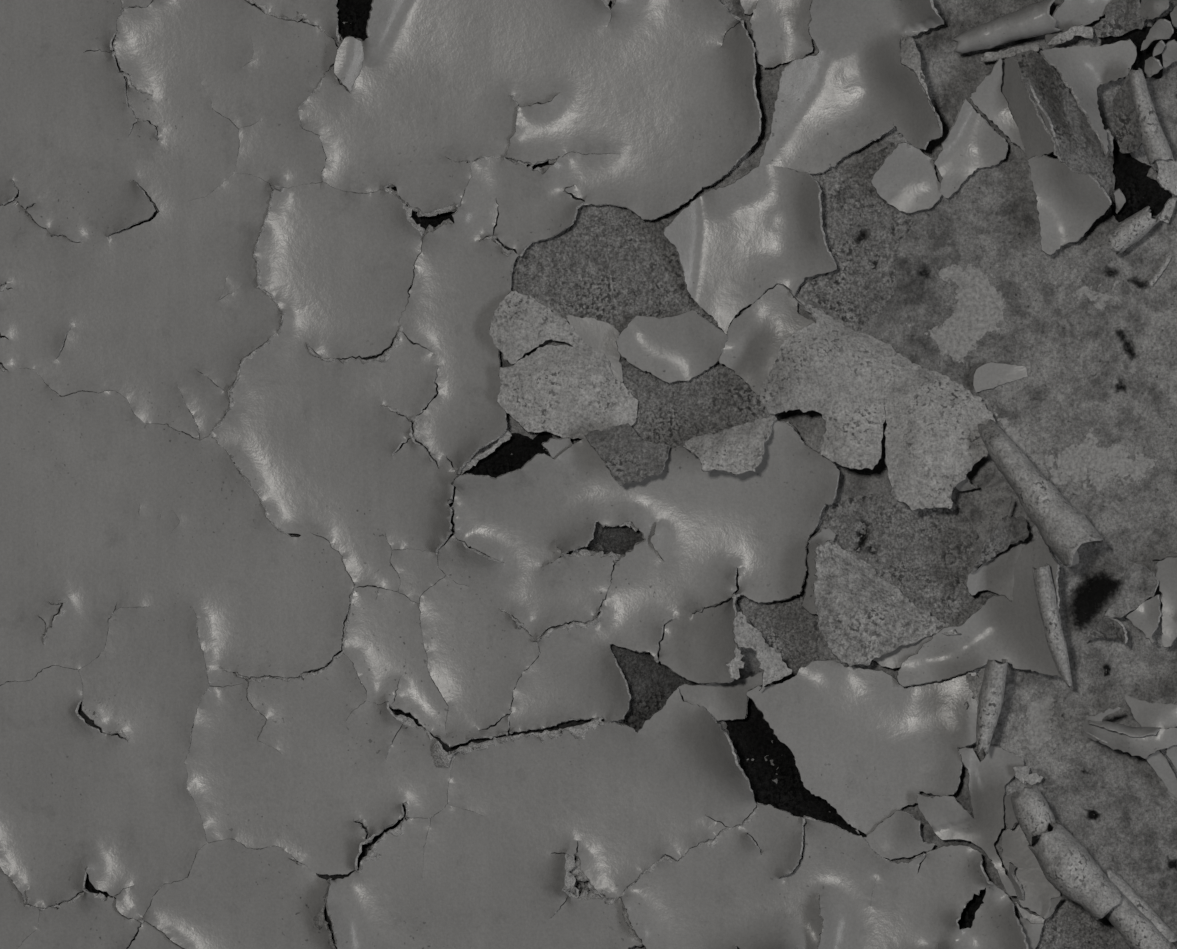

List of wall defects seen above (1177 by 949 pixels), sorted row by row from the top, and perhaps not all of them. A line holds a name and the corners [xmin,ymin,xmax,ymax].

crack [245,0,343,91]
crack [122,184,160,231]
crack [479,203,518,257]
crack [306,326,416,364]
crack [385,376,453,468]
peeling [462,0,1177,949]
crack [212,580,402,687]
crack [427,564,615,768]
crack [707,568,739,608]
crack [78,702,131,741]
crack [291,802,431,949]
crack [592,807,760,941]